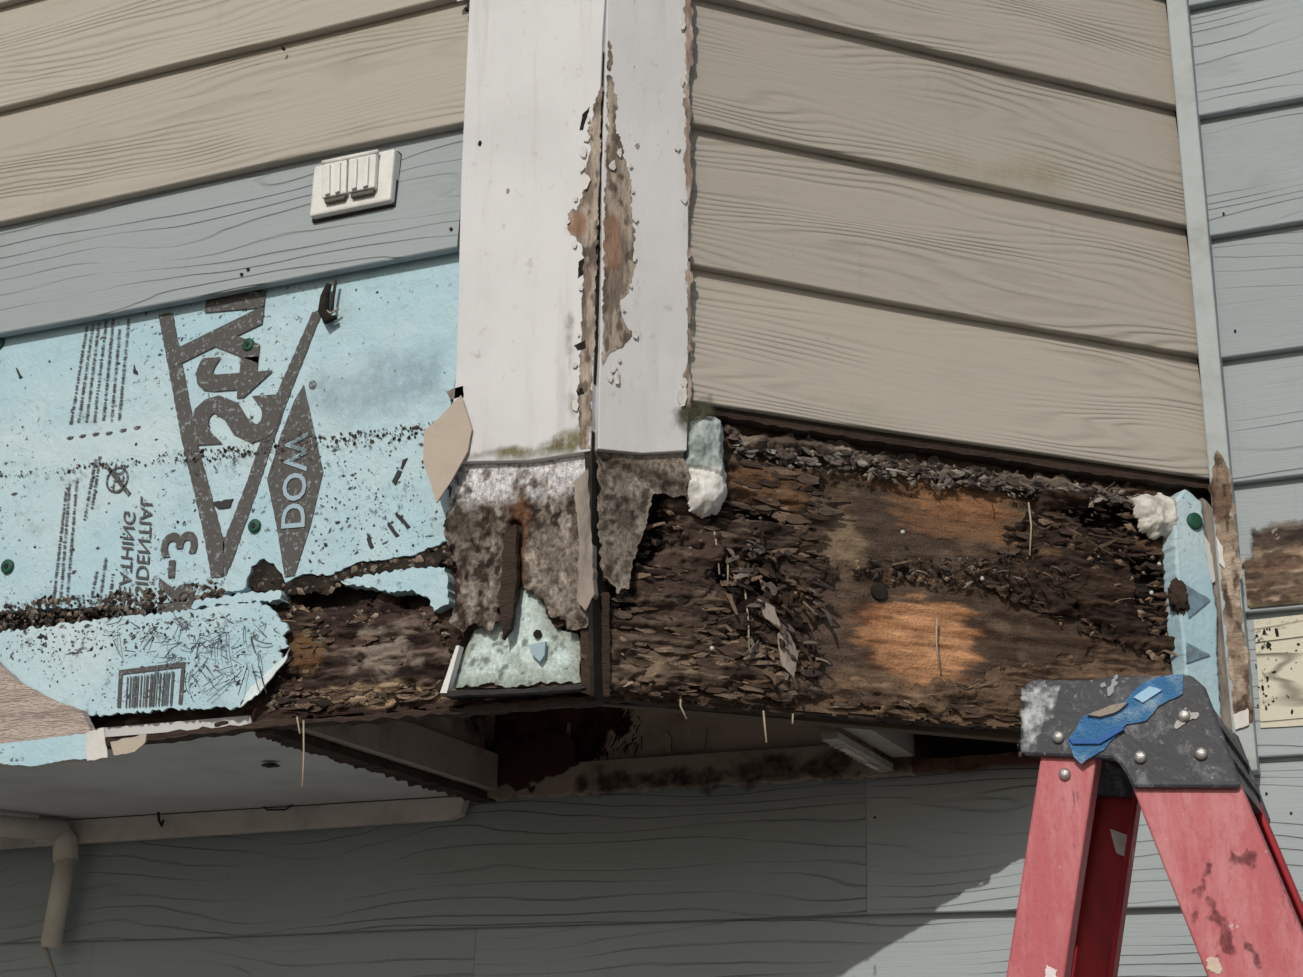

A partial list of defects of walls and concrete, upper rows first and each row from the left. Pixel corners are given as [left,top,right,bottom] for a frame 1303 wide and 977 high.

peeling [567,41,639,449]
peeling [757,599,798,677]
peeling [86,727,147,761]
leakage [578,751,850,794]
leakage [875,745,930,770]